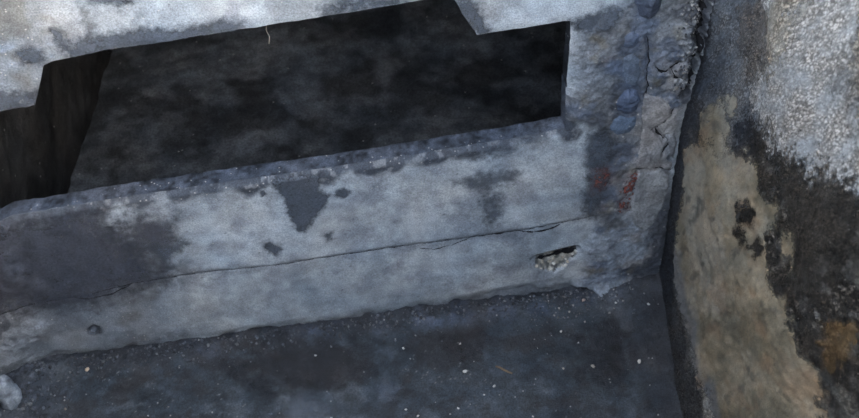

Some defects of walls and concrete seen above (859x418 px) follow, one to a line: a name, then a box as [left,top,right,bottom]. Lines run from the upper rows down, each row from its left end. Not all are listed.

leakage [260,173,350,232]
leakage [456,171,519,223]
rust [618,170,638,213]
leakage [730,0,859,418]
crack [97,216,592,298]
spalling [535,245,577,272]